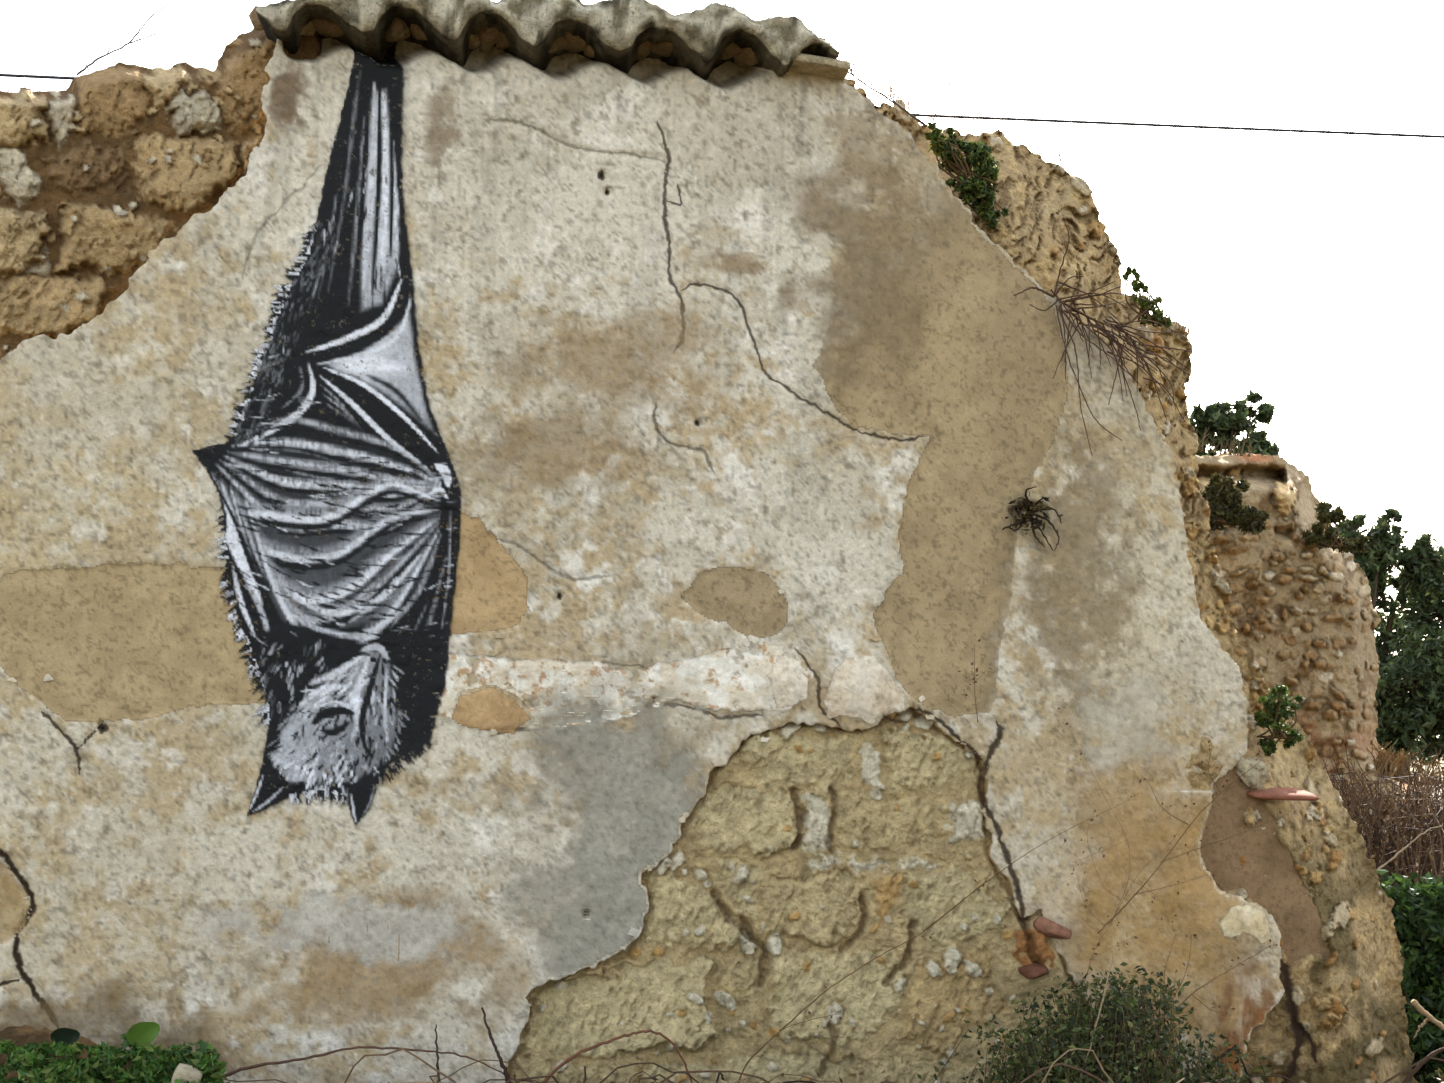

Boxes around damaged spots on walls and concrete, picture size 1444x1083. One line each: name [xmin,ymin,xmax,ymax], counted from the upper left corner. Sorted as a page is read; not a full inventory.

crack [657,121,926,441]
peeling [0,561,266,723]
spalling [435,209,1103,1083]
crack [883,707,1026,926]
crack [0,849,48,1006]